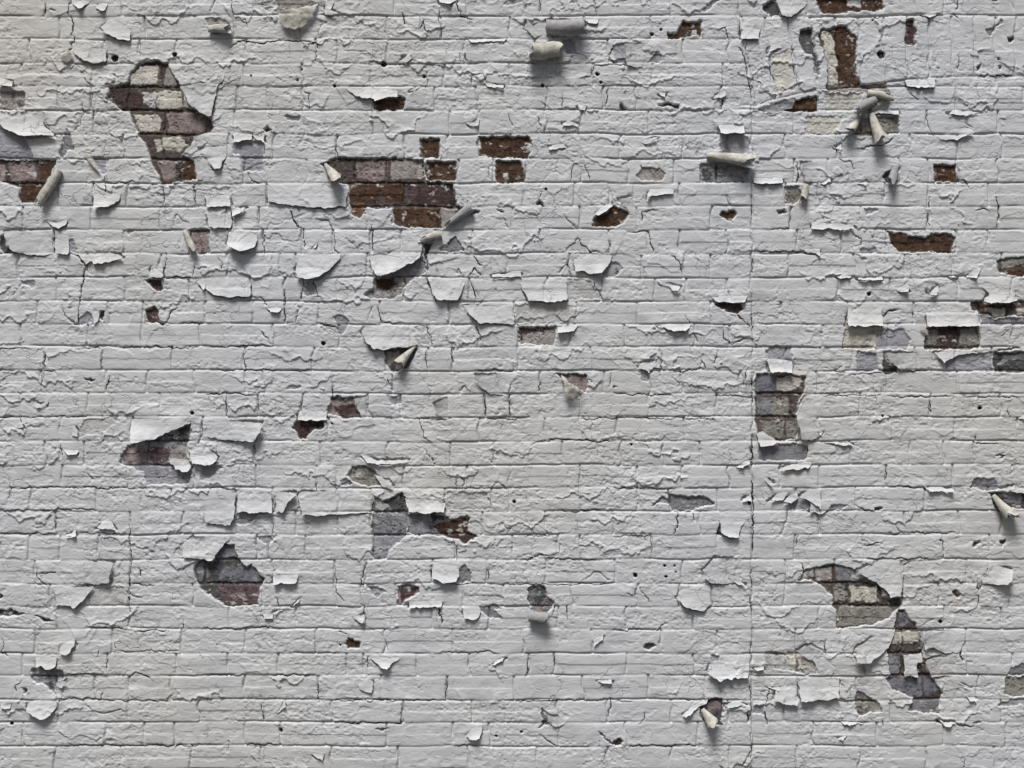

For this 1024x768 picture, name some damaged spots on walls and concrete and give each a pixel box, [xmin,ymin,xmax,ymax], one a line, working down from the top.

peeling [0,77,74,208]
peeling [107,53,228,185]
peeling [465,116,533,184]
peeling [761,0,900,150]
peeling [268,138,479,299]
peeling [887,231,955,254]
peeling [837,257,1024,375]
peeling [120,411,221,485]
peeling [340,454,492,560]
peeling [737,346,853,468]
peeling [175,536,300,619]
peeling [799,560,977,727]